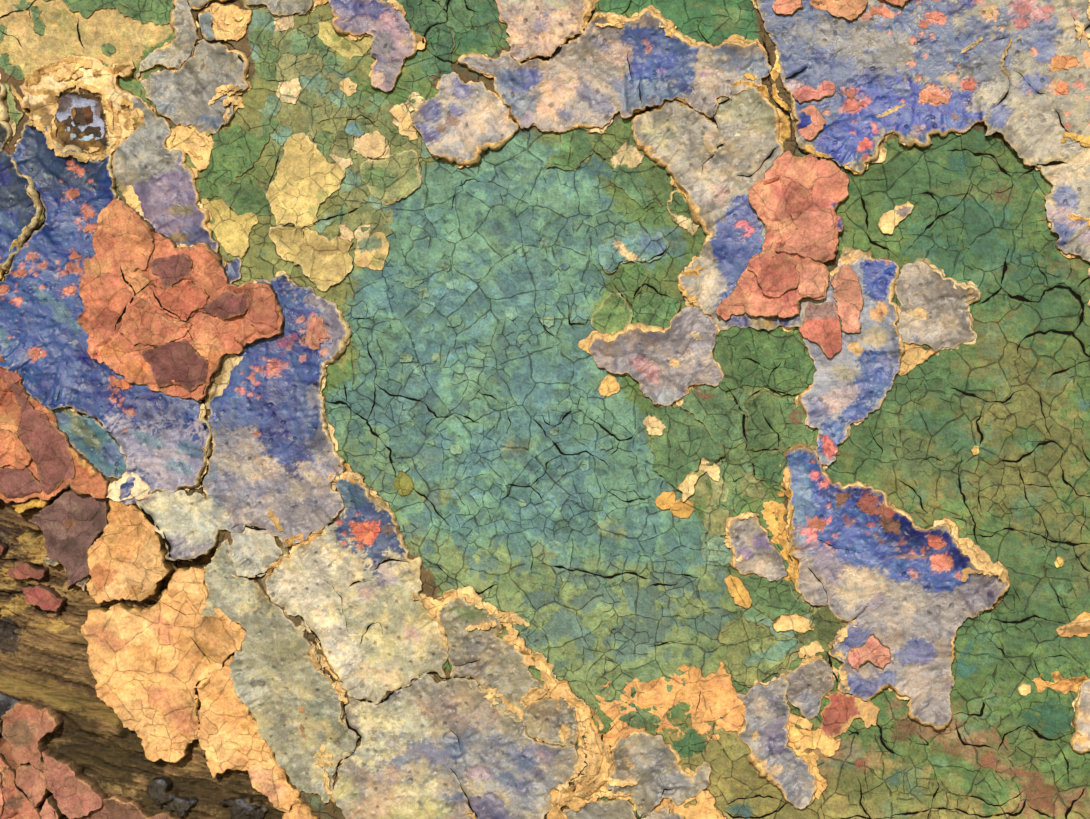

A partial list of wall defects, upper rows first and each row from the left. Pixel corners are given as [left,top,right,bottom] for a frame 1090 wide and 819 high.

crack [187,0,244,62]
peeling [322,0,1090,263]
peeling [0,0,394,605]
peeling [80,72,880,819]
crack [326,316,656,527]
crack [721,358,792,482]
peeling [681,246,981,466]
crack [898,250,1090,572]
crack [324,558,497,647]
crack [530,550,697,590]
peeling [782,442,1010,731]
crack [821,693,1088,819]